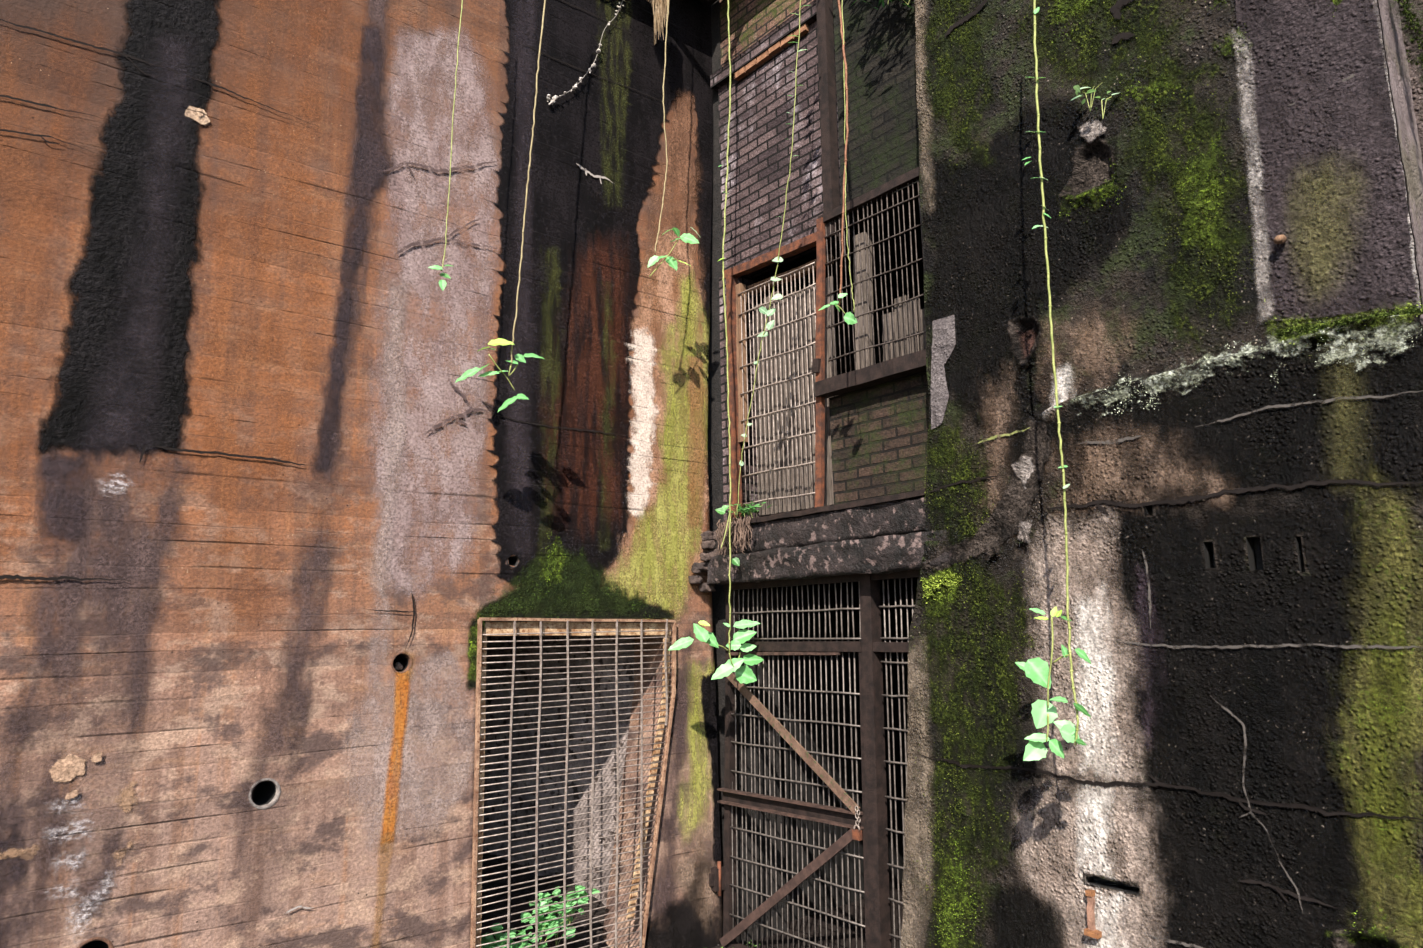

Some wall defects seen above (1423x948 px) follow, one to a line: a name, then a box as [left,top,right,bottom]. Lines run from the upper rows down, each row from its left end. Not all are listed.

damp [315,0,713,618]
damp [0,0,222,948]
damp [256,530,331,781]
corrosion [381,671,409,844]
damp [901,651,931,948]
crack [908,695,1423,912]
damp [915,0,1423,948]
crack [1106,550,1419,649]
spalling [1328,913,1401,948]